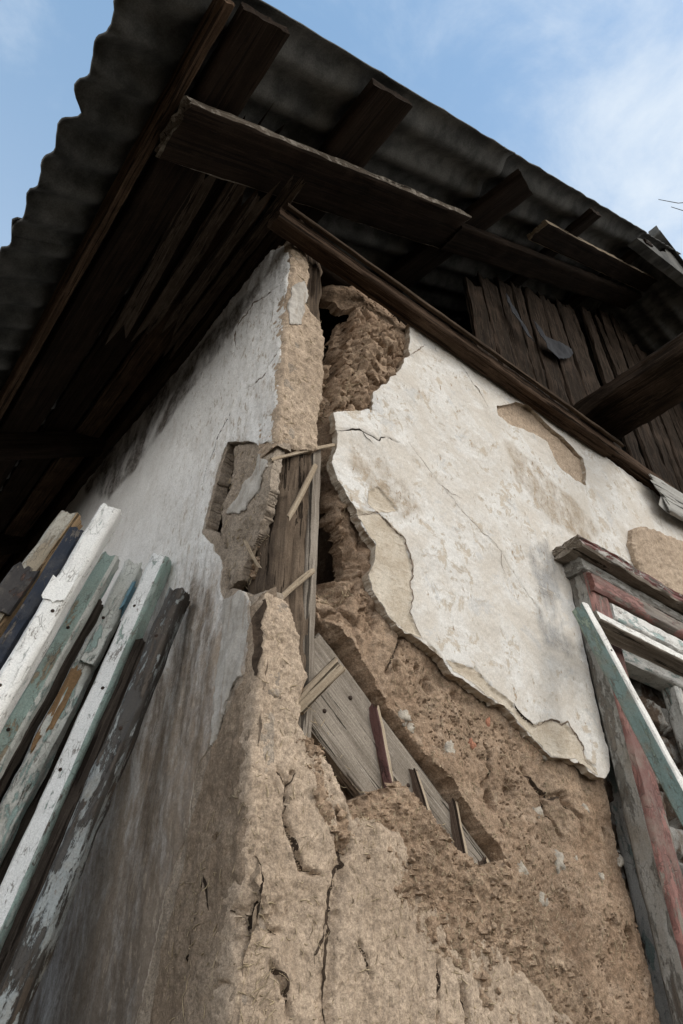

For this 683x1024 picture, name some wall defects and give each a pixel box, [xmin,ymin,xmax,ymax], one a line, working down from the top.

leakage [85,296,254,496]
crack [337,428,540,610]
spalling [149,442,285,1024]
spalling [287,281,661,1024]
crack [186,853,276,962]
crack [269,969,290,1013]
crack [276,772,344,1023]